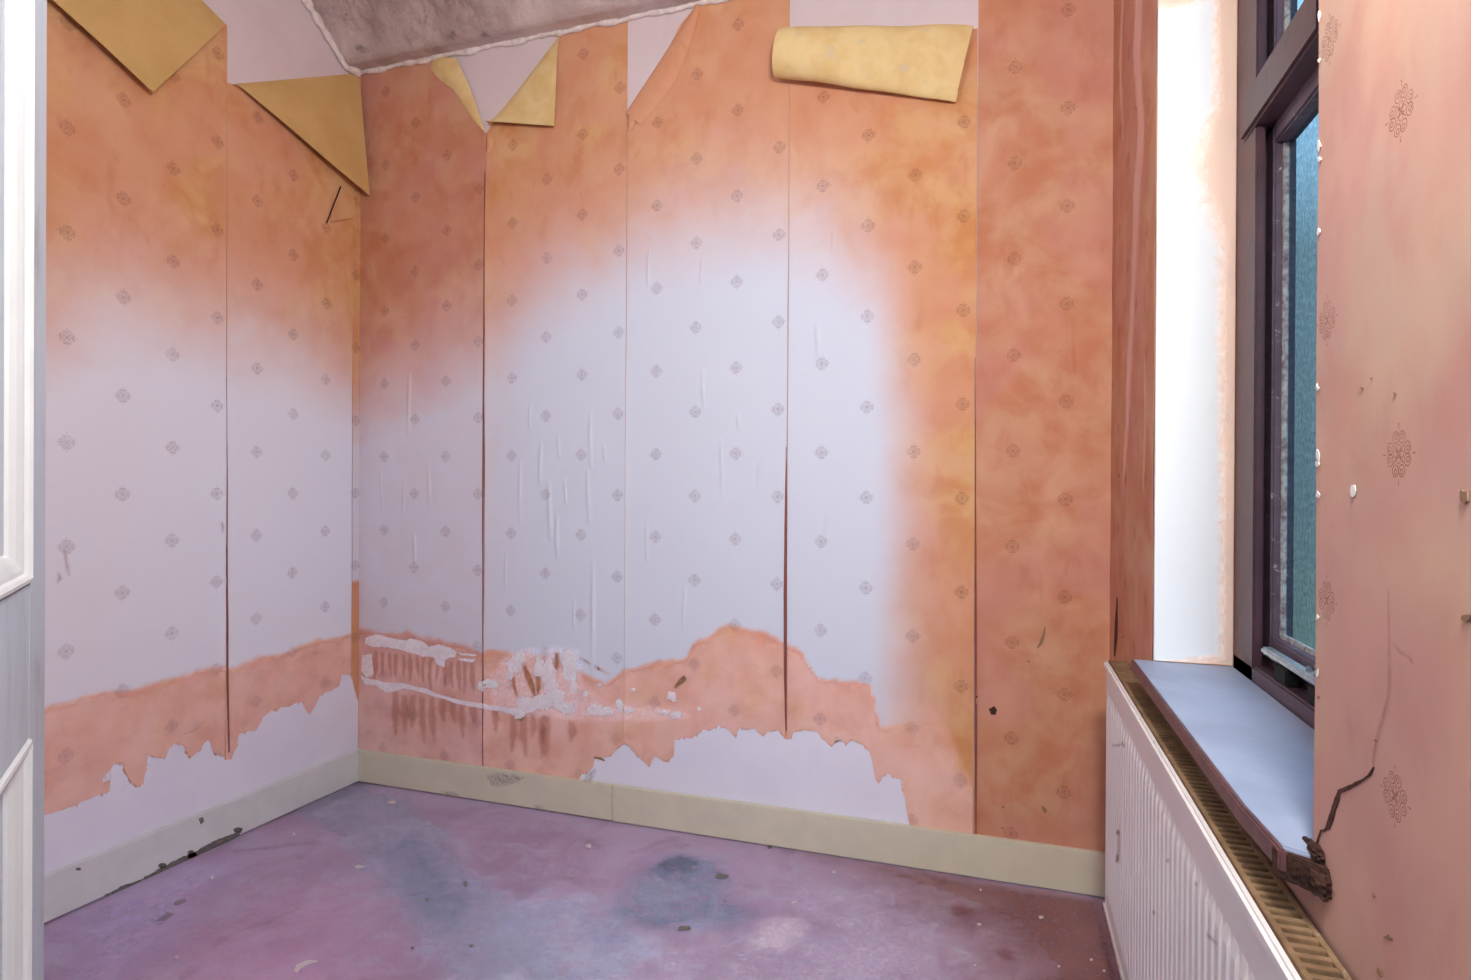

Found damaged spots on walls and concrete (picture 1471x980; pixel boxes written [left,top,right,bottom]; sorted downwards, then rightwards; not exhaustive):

peeling [204,0,350,84]
peeling [452,36,558,133]
water stain [45,79,979,737]
peeling [44,634,524,874]
peeling [579,725,909,825]
crack [1316,767,1374,844]
peeling [104,827,243,897]